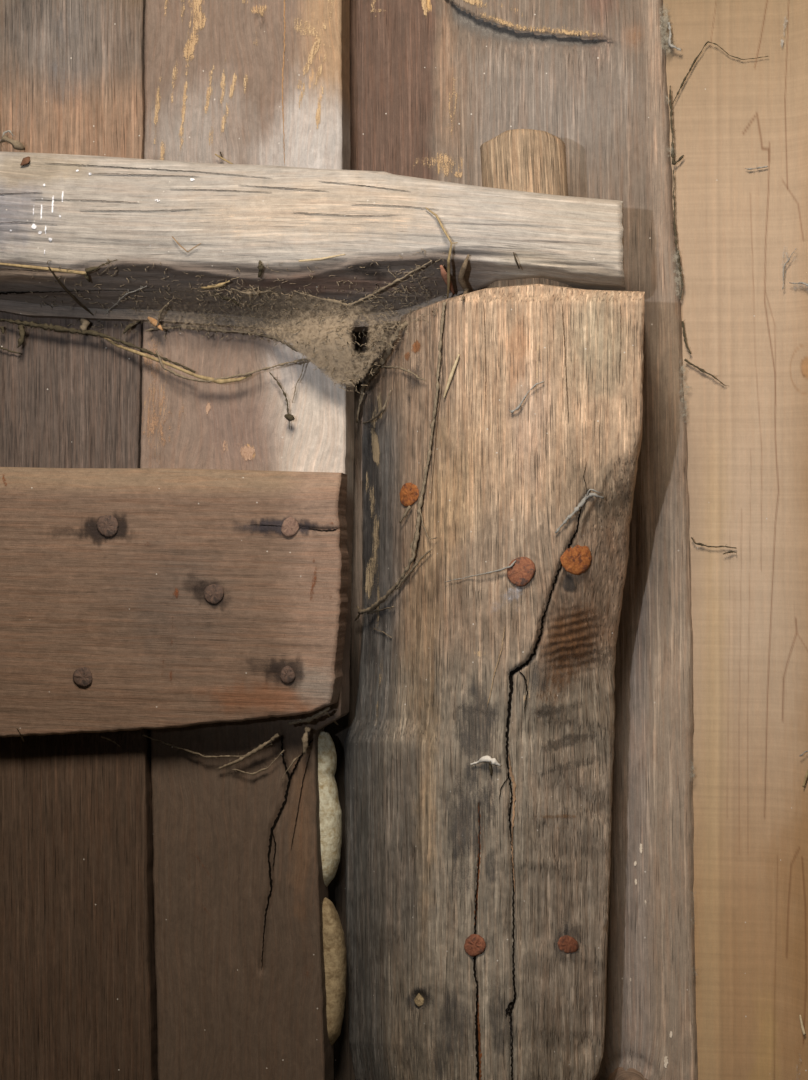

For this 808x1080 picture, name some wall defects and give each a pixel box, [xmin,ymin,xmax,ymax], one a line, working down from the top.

crack [473,462,587,1080]